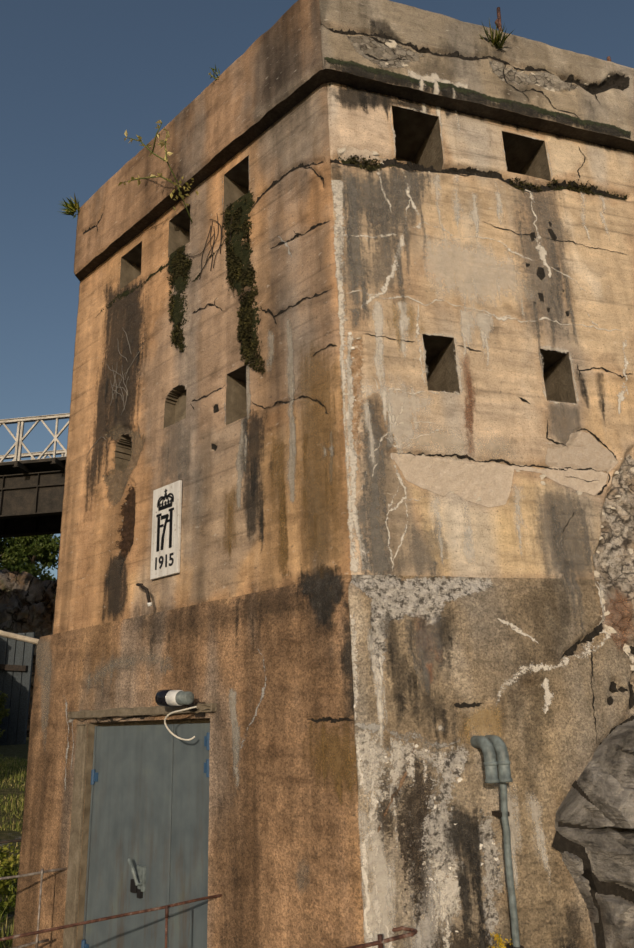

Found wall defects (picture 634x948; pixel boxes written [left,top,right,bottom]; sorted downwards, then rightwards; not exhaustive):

spalling [344,35,424,68]
crack [321,24,621,123]
spalling [489,60,630,95]
leakage [86,280,146,505]
crack [96,253,176,317]
spalling [331,180,493,678]
crack [252,147,633,571]
leakage [518,191,575,361]
leakage [102,556,128,621]
spalling [391,431,634,708]
crack [454,582,634,745]
leakage [359,751,492,948]